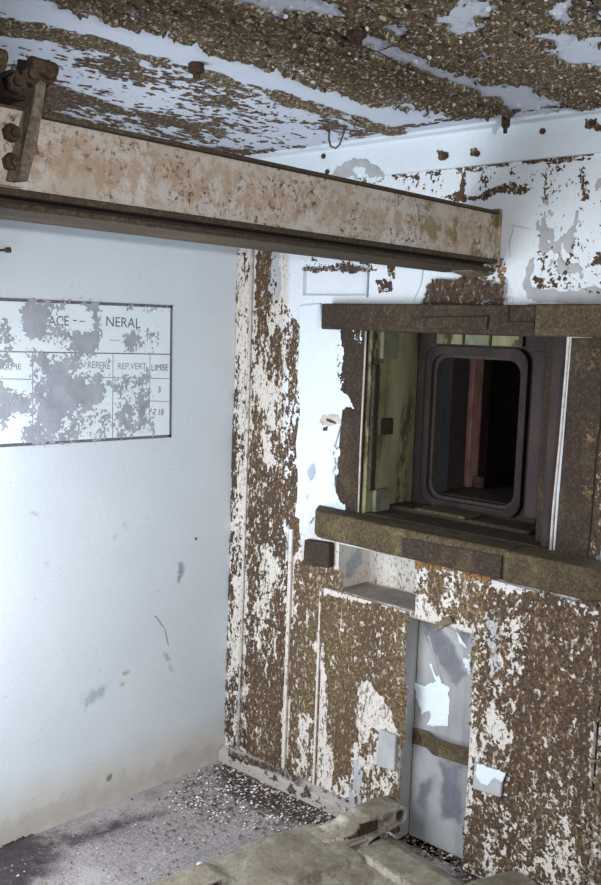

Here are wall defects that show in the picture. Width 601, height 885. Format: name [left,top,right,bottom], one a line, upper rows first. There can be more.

corrosion [42,83,306,156]
peeling [2,43,370,141]
corrosion [357,147,601,224]
corrosion [420,258,508,305]
peeling [522,190,601,304]
peeling [0,297,170,447]
peeling [224,249,363,813]
corrosion [243,250,412,806]
peeling [485,608,504,683]
corrosion [414,560,601,885]
leakage [0,834,58,885]
leakage [67,819,141,845]